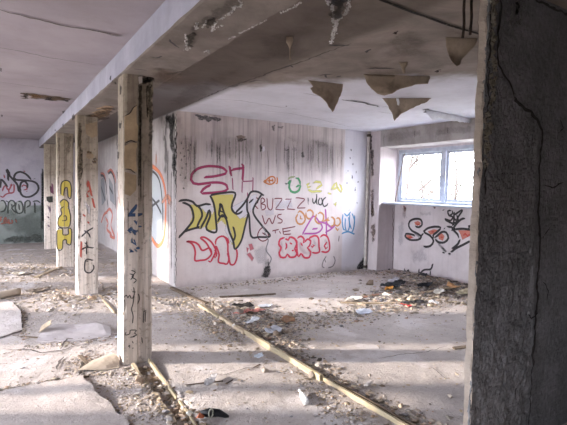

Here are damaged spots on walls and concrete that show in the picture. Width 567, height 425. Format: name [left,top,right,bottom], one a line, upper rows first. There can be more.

crack [2,10,123,36]
spalling [325,0,351,44]
flaking render [446,37,477,67]
flaking render [308,80,343,112]
flaking render [363,62,471,123]
crack [379,0,567,425]